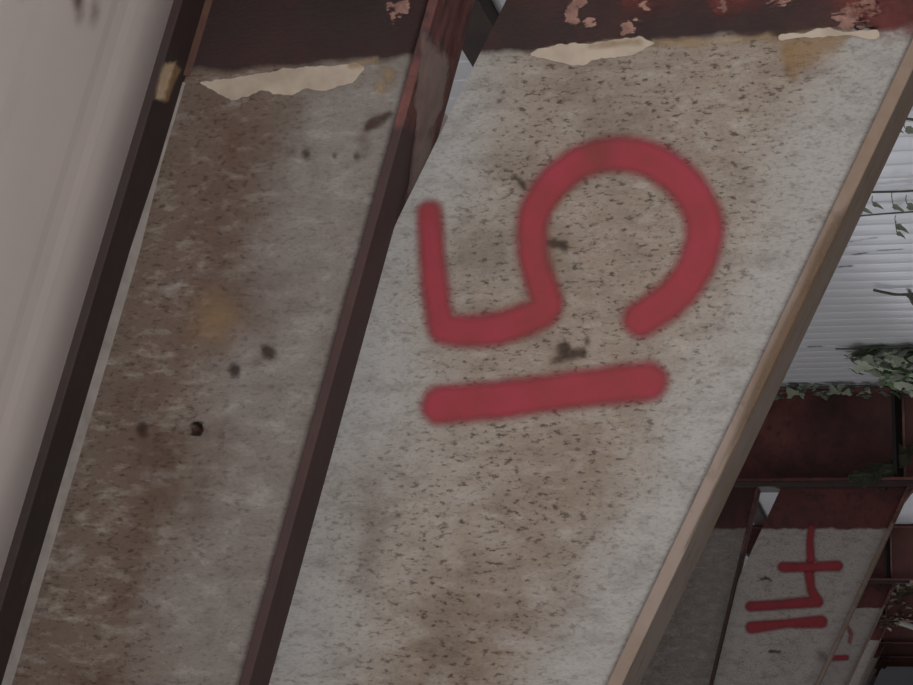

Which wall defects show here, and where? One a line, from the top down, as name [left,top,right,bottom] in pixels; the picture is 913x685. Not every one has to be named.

peeling [529,0,746,66]
peeling [200,60,376,101]